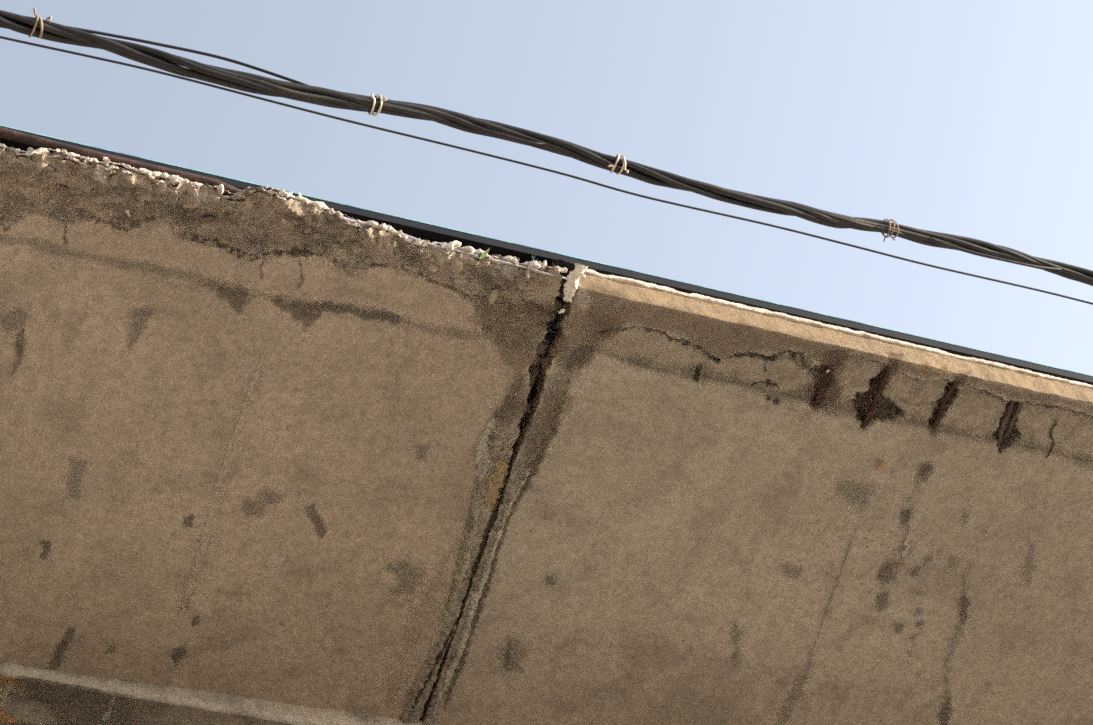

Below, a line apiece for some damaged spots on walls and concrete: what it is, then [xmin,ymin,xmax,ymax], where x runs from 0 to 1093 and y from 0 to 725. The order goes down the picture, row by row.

spalling [0,144,568,343]
leakage [274,297,399,326]
crack [518,259,575,430]
leakage [480,263,847,370]
crack [623,328,837,405]
rust [859,353,902,428]
rust [929,366,969,436]
crack [978,392,1087,459]
crack [468,463,507,580]
leakage [877,510,911,611]
crack [410,618,458,714]